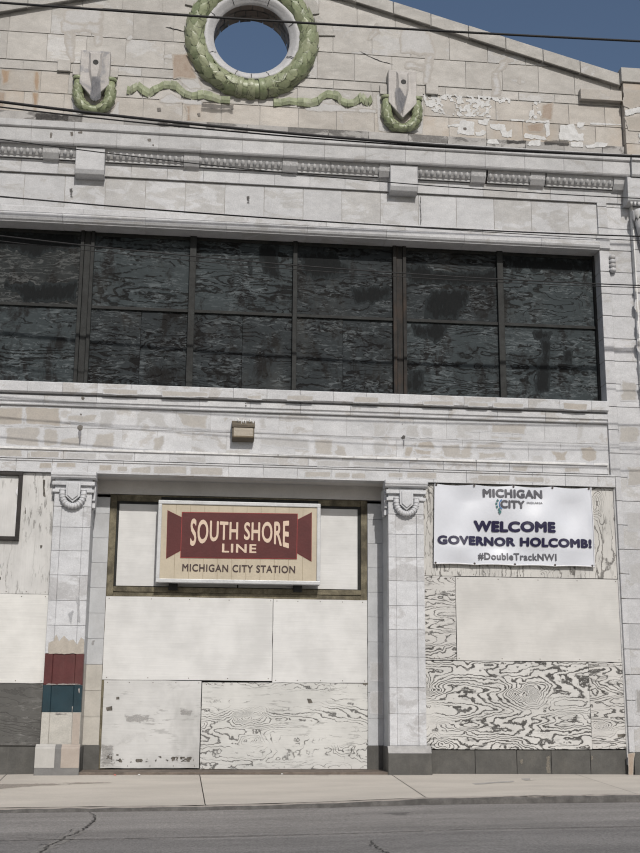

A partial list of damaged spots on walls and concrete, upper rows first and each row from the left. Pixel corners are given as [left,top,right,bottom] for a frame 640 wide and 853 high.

peeling [447,94,499,144]
peeling [510,102,550,146]
peeling [622,89,640,131]